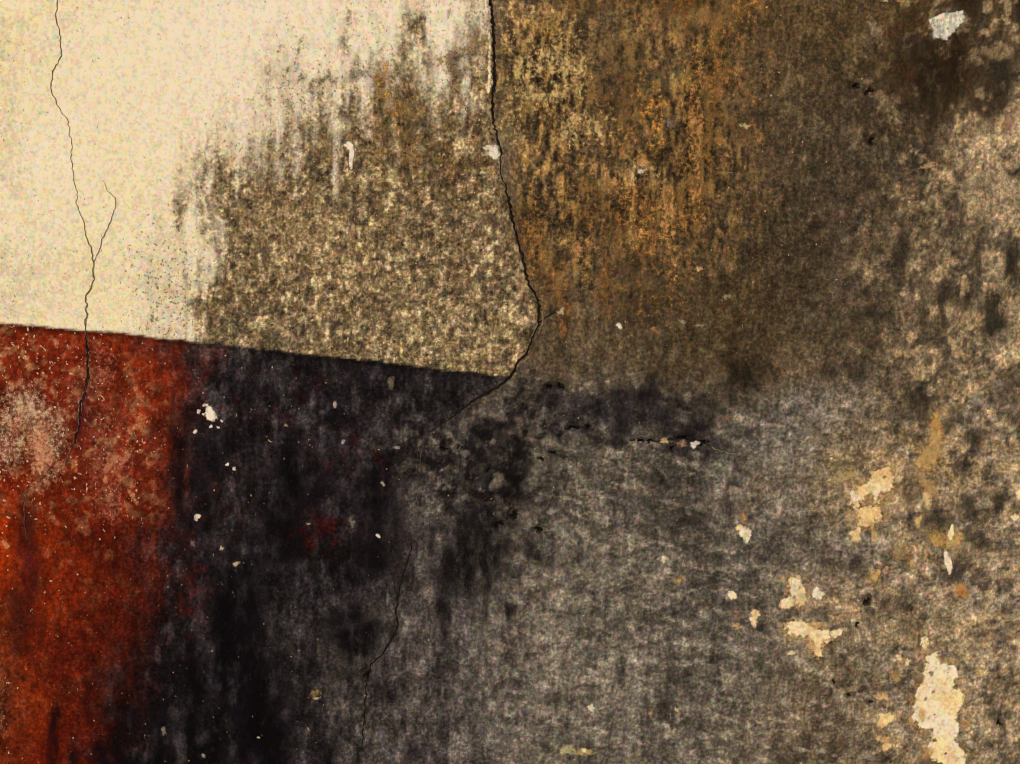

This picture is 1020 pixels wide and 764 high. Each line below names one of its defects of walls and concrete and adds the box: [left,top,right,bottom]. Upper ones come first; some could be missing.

corrosion [510,0,764,343]
crack [23,0,116,532]
crack [356,0,557,762]
damp [467,417,532,513]
damp [442,506,509,599]
damp [47,701,78,764]
damp [182,562,282,764]
flaking render [876,712,895,751]
spalling [890,632,985,764]